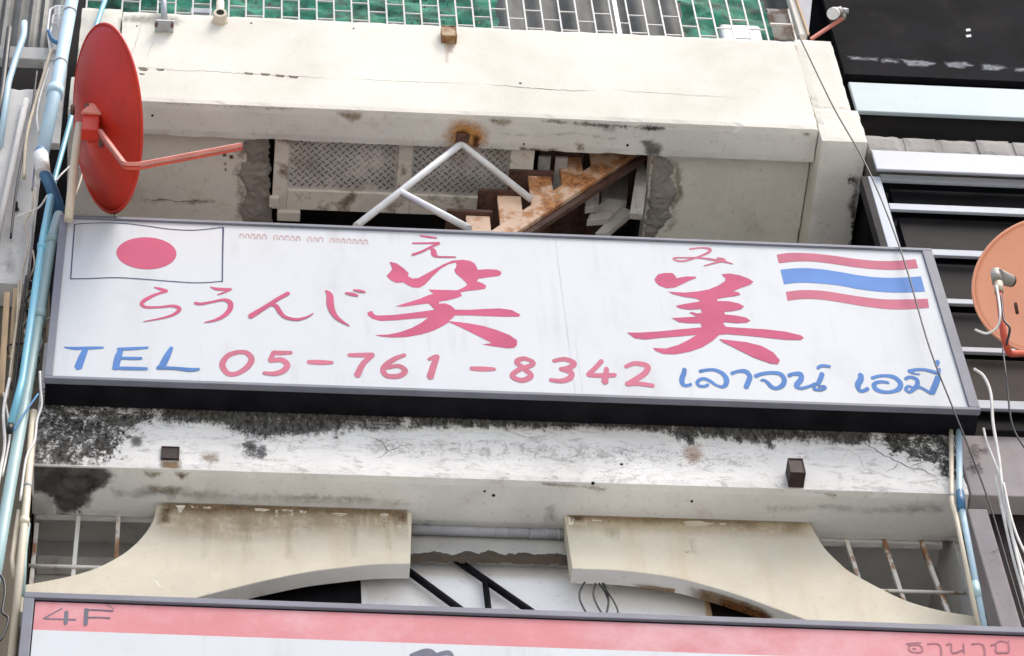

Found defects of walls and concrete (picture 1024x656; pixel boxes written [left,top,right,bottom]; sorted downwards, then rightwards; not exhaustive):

corrosion [449,123,483,148]
spalling [237,139,273,223]
spalling [643,155,677,238]
leakage [34,389,982,514]
crack [840,443,934,475]
spalling [410,550,568,566]